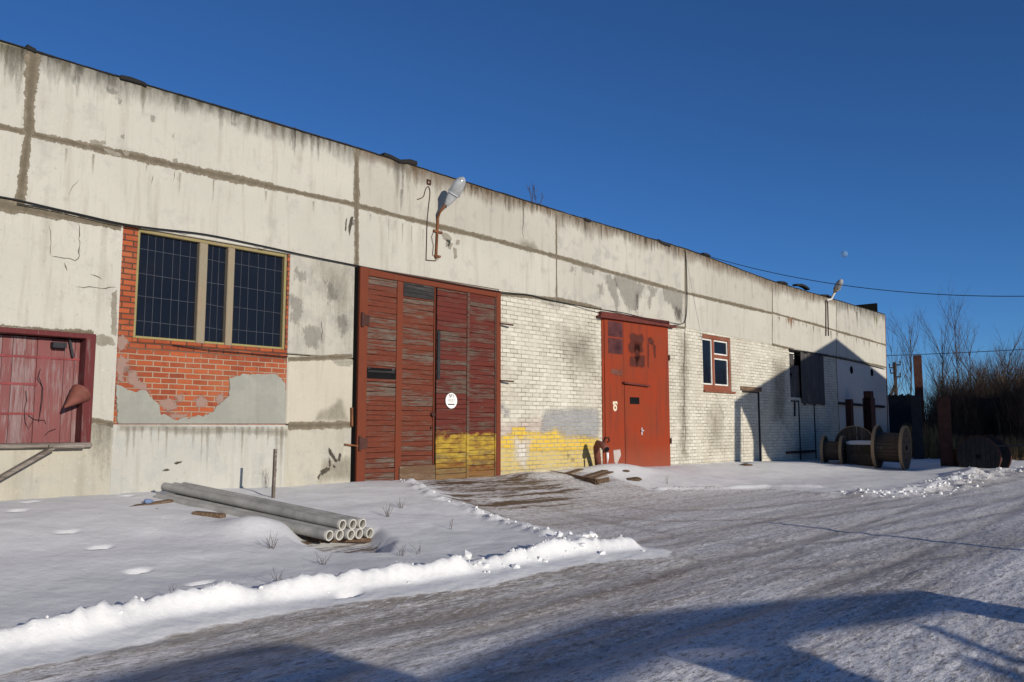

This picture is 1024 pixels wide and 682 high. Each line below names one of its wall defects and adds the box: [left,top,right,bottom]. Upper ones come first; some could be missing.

crack [49,223,117,289]
flaking render [96,290,287,430]